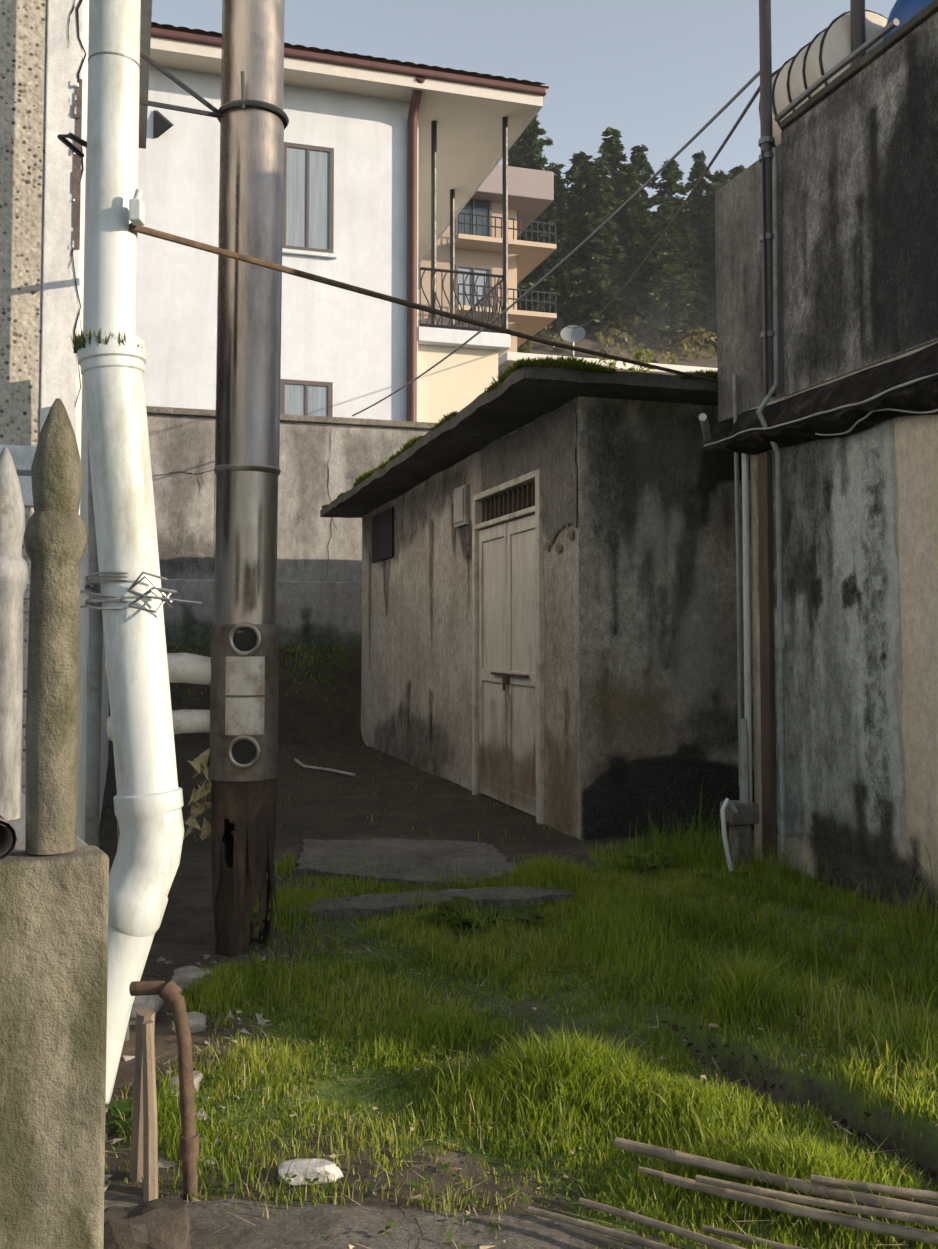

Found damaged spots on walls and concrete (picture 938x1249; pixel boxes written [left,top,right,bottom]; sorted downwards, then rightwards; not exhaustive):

damp [744,38,938,392]
damp [363,472,472,634]
damp [546,402,846,840]
damp [788,541,938,924]